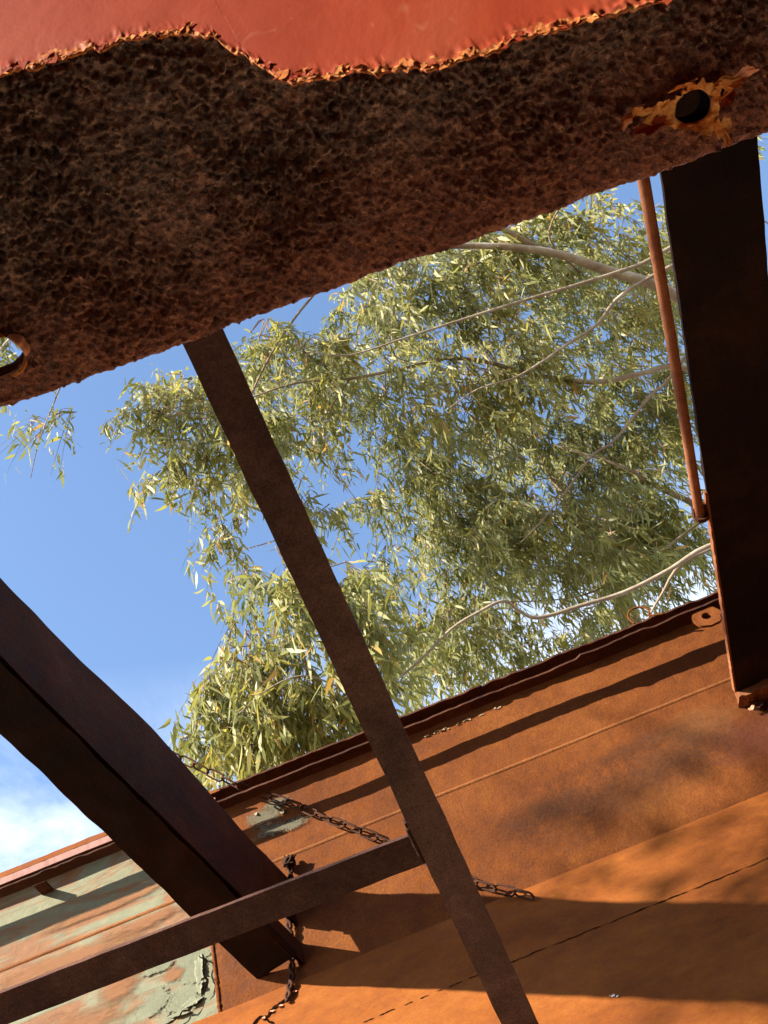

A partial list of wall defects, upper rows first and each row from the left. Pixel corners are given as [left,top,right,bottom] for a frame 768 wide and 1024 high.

peeling [93,22,193,51]
peeling [536,13,599,36]
peeling [0,52,66,76]
peeling [256,46,484,83]
peeling [620,65,759,147]
corrosion [49,884,158,930]
corrosion [0,909,173,991]
corrosion [53,977,134,1024]
peeling [140,948,212,1018]